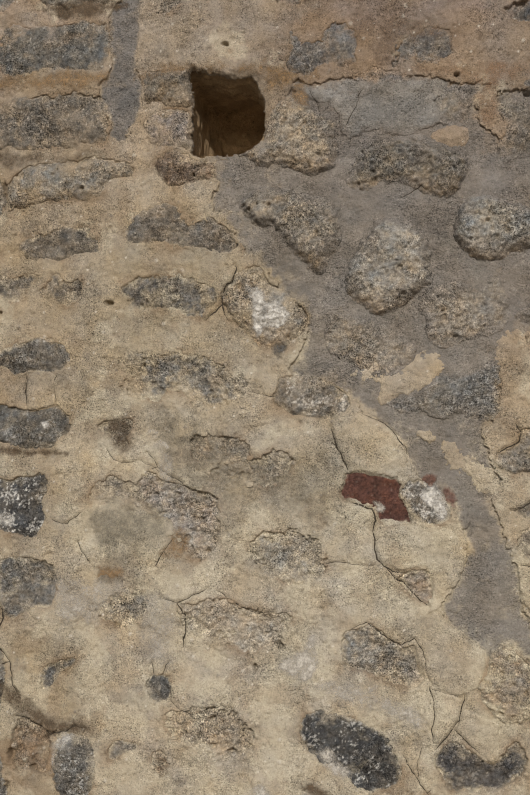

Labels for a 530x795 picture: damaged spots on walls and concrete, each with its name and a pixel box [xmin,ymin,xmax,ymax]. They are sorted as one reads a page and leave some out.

spalling [190,432,293,488]
crack [331,428,348,470]
spalling [247,528,327,587]
crack [326,503,427,605]
spalling [399,566,434,605]
spalling [177,597,292,659]
crack [356,622,477,795]